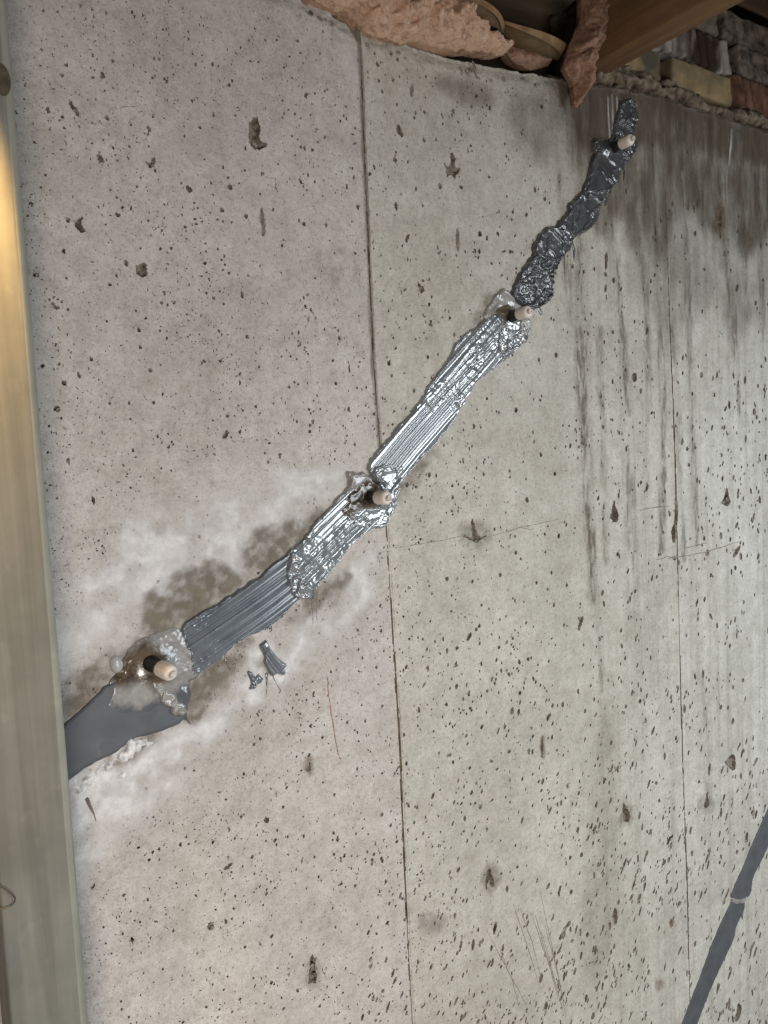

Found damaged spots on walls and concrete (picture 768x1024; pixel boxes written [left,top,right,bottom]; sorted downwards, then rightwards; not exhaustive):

damp [559,82,768,264]
crack [64,99,639,781]
damp [577,346,588,452]
damp [82,471,336,632]
damp [64,556,374,832]